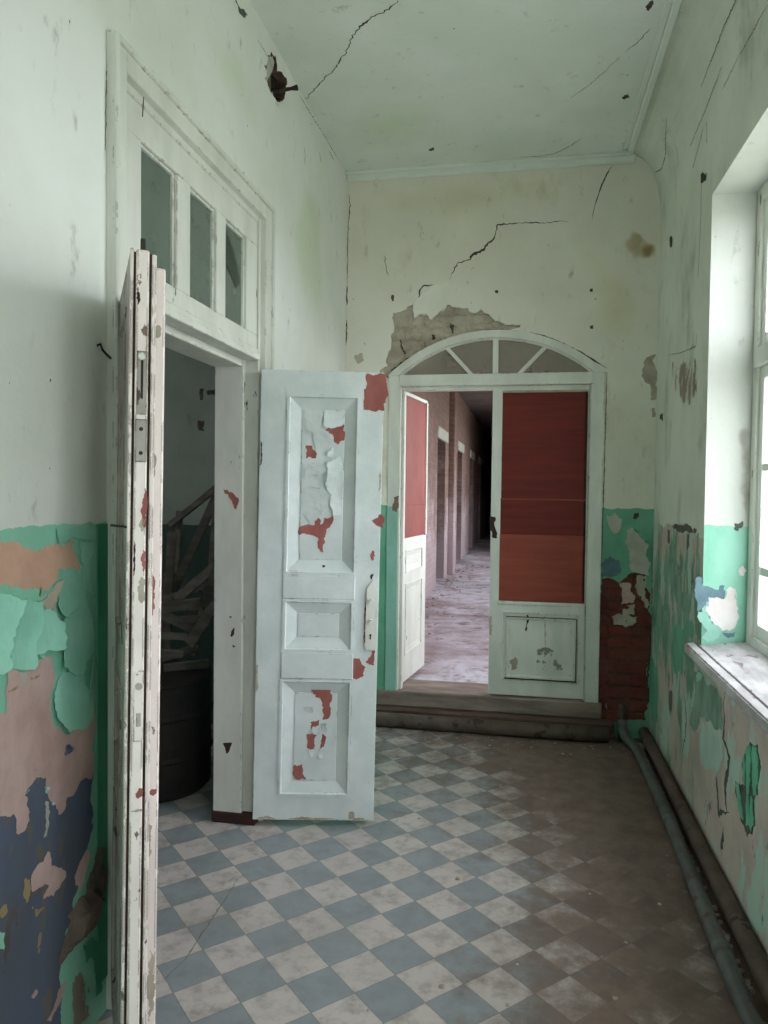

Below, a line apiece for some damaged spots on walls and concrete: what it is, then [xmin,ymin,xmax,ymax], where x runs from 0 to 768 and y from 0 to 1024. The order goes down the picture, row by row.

flaking render [265,56,298,101]
crack [299,1,398,162]
crack [413,221,567,304]
flaking render [379,282,520,378]
peeling [641,354,663,421]
peeling [667,523,697,549]
flaking render [598,513,673,723]
peeling [671,577,739,775]
peeling [0,539,102,1024]
peeling [735,742,761,837]